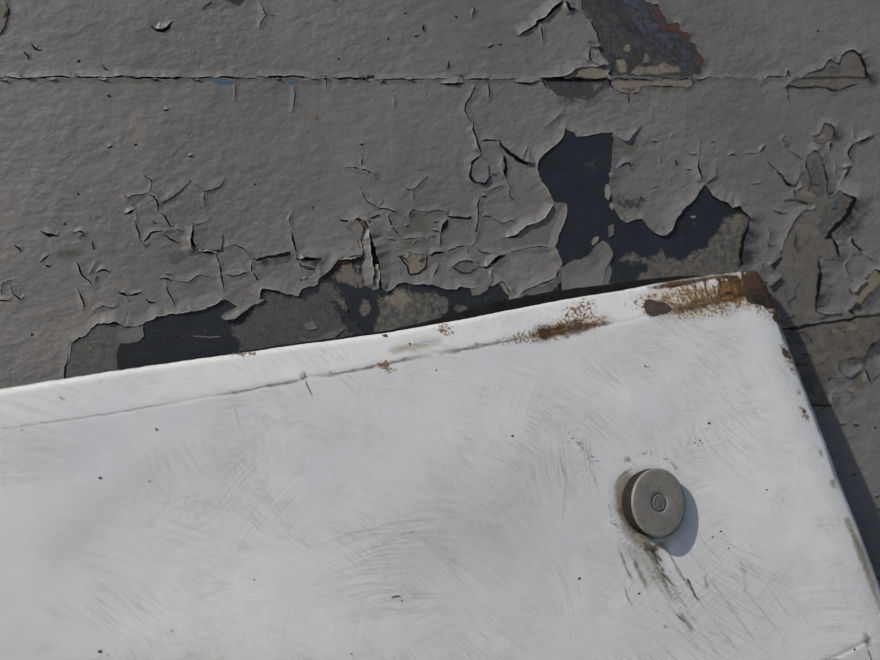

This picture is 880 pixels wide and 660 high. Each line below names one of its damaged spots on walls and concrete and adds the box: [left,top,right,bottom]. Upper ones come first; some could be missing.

spalling [0,0,13,38]
peeling [202,0,244,11]
peeling [536,0,721,108]
peeling [499,138,536,169]
peeling [605,172,614,210]
peeling [58,206,524,380]
rust [506,299,606,344]
peeling [561,224,614,290]
rust [632,270,802,395]
peeling [760,116,880,415]